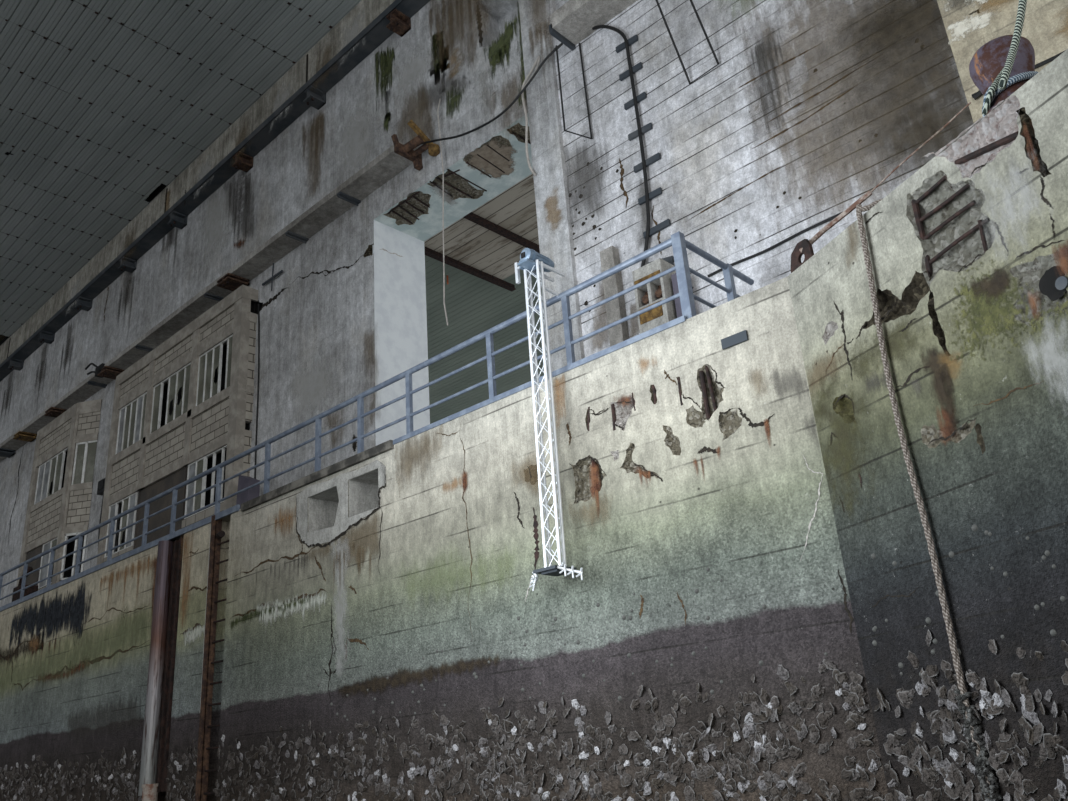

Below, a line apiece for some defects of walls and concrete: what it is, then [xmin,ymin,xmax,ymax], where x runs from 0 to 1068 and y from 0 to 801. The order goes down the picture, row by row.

damp [374,48,395,111]
damp [489,42,510,79]
damp [898,108,966,151]
peeling [383,123,531,225]
spalling [857,95,1068,356]
crack [261,249,403,309]
spalling [585,392,636,431]
spalling [676,364,742,440]
corrosion [924,349,957,424]
spalling [570,455,606,504]
crack [232,468,386,696]
damp [0,596,81,663]